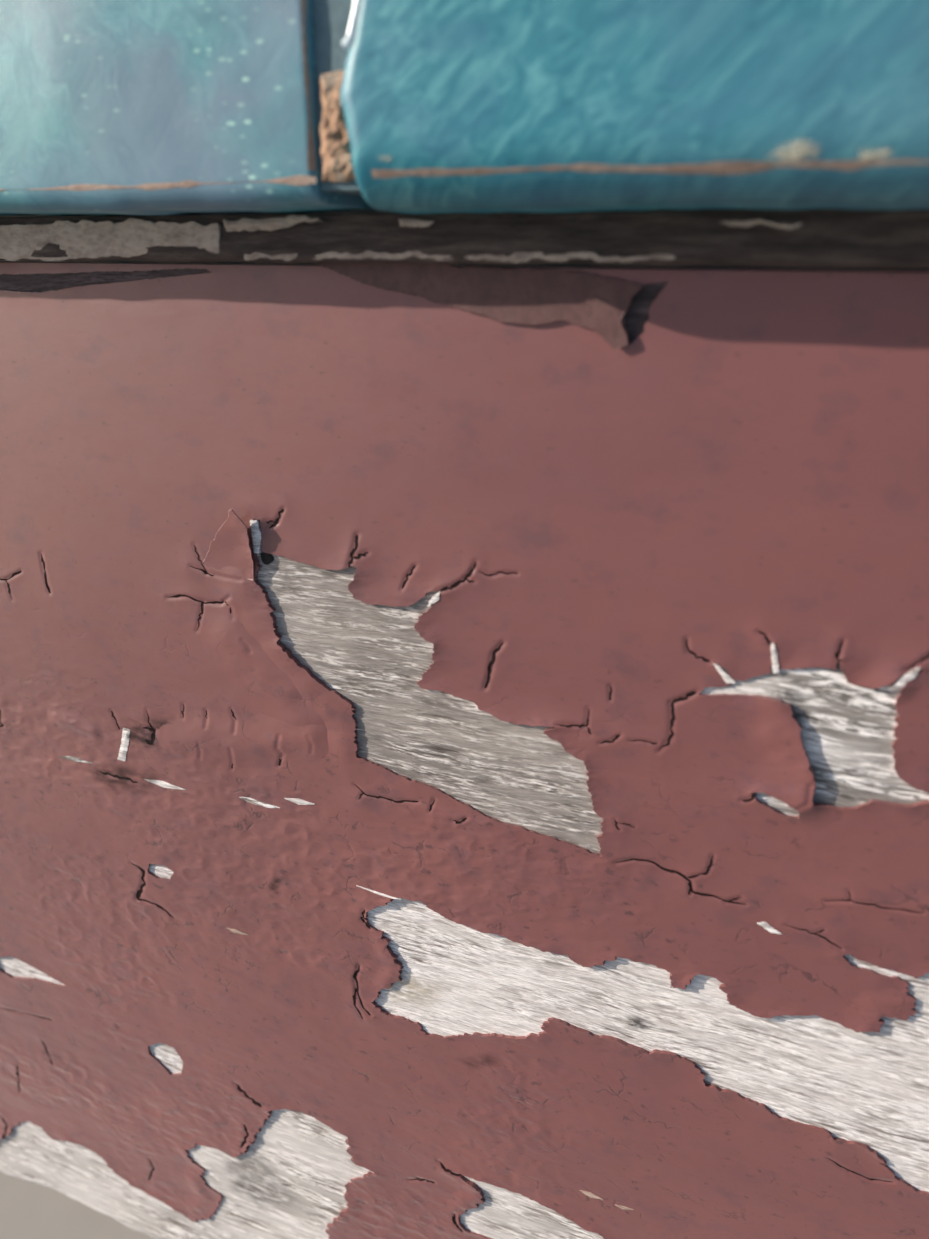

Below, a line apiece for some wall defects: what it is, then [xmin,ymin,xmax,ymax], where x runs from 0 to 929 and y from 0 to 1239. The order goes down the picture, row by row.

crack [0,554,50,597]
crack [171,546,232,631]
crack [437,562,518,592]
peeling [203,509,603,854]
crack [485,642,503,688]
crack [556,686,696,751]
peeling [700,643,929,833]
crack [616,855,746,905]
peeling [150,1043,183,1073]
peeling [356,885,929,1205]
peeling [0,1109,374,1239]
peeling [447,1173,604,1239]